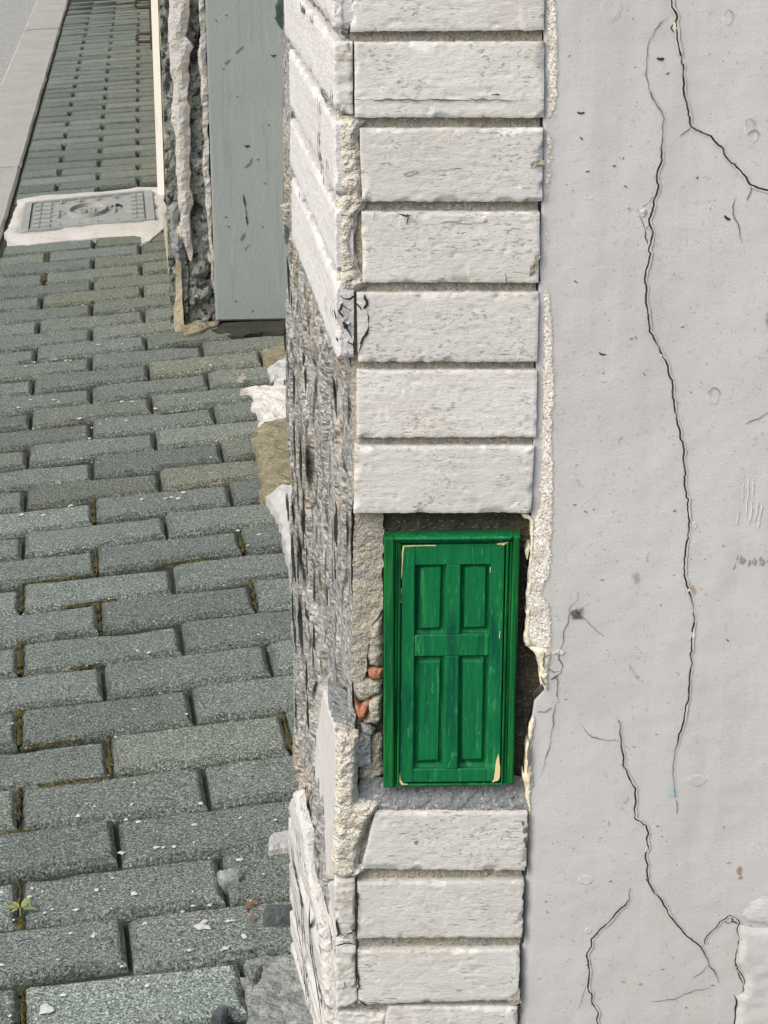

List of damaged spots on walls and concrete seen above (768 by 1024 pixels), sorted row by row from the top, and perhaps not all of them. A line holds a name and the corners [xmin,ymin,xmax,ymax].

crack [299,131,327,198]
crack [330,294,369,358]
crack [640,0,768,814]
flaking render [521,513,564,690]
flaking render [354,612,383,780]
flaking render [521,715,535,848]
crack [577,720,746,1024]